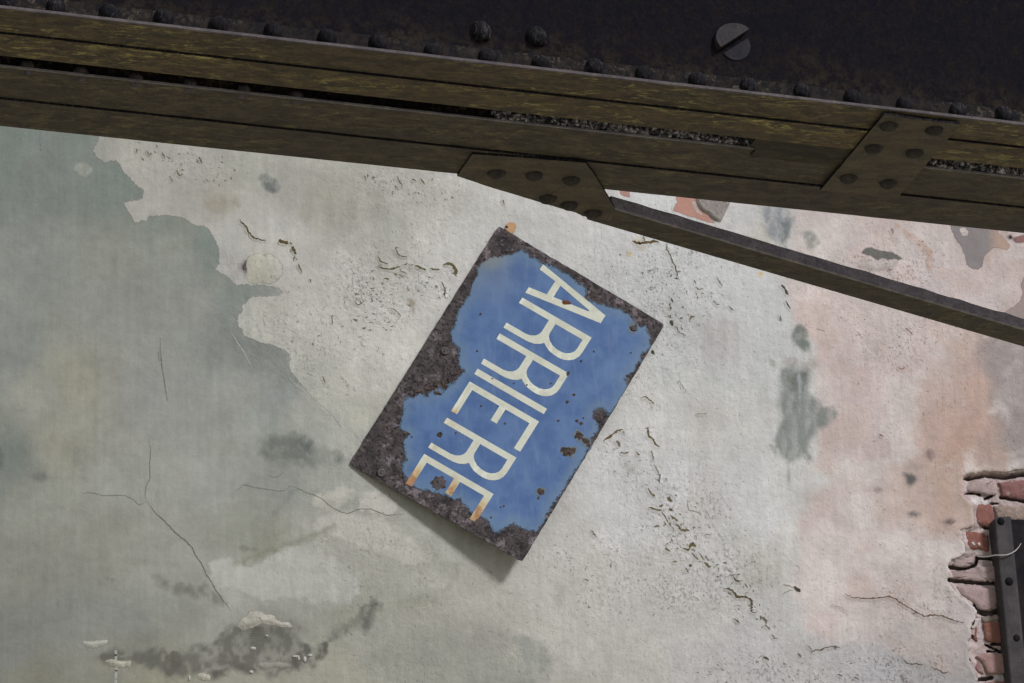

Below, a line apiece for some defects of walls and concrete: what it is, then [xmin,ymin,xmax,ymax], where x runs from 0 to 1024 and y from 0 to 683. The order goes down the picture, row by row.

water stain [258,171,281,194]
flaking render [673,197,730,224]
flaking render [950,225,1024,269]
peeling [73,136,438,426]
water stain [767,321,840,491]
water stain [256,428,349,473]
crack [240,472,402,516]
crack [86,439,229,608]
peeling [207,480,424,630]
flaking render [947,469,1024,683]
crack [832,593,979,628]
water stain [291,640,329,673]